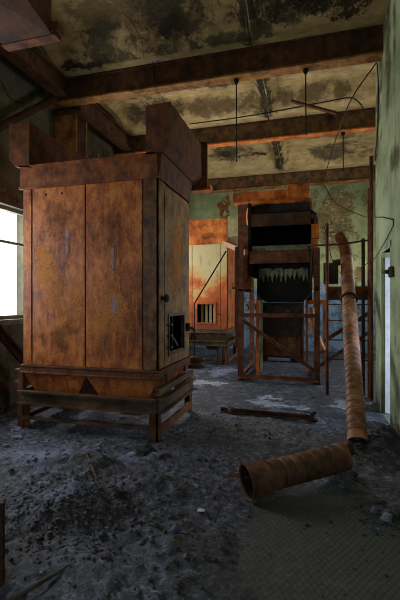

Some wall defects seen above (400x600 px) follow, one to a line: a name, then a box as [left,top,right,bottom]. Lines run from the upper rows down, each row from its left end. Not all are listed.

damp [60,0,372,72]
damp [376,5,395,120]
damp [127,78,351,126]
damp [209,141,288,170]
damp [306,130,382,161]
peeling [311,188,359,257]